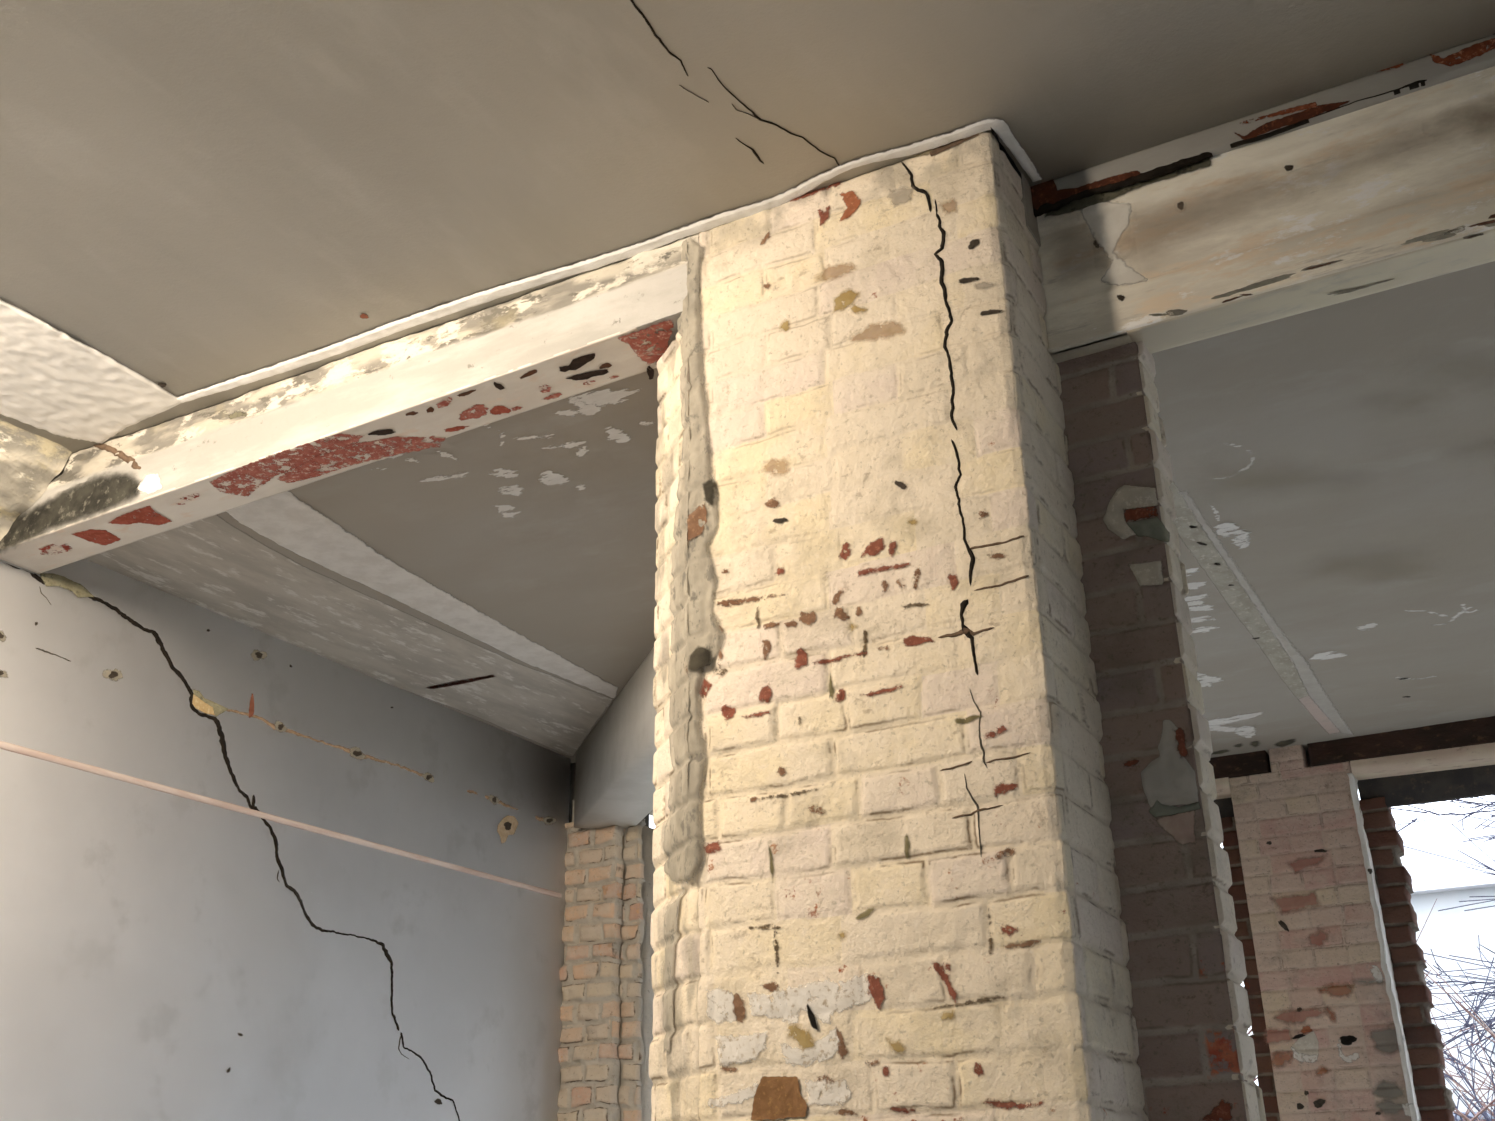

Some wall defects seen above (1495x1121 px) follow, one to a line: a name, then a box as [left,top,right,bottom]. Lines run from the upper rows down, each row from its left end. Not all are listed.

crack [630,0,840,166]
rust [1234,101,1349,140]
rust [1429,38,1495,67]
rust [1031,171,1140,210]
peeling [520,353,619,400]
crack [901,162,1029,854]
flaking render [39,382,613,757]
peeling [718,594,816,660]
peeling [794,590,933,702]
peeling [838,537,929,608]
crack [6,563,460,1121]
peeling [707,924,885,1121]